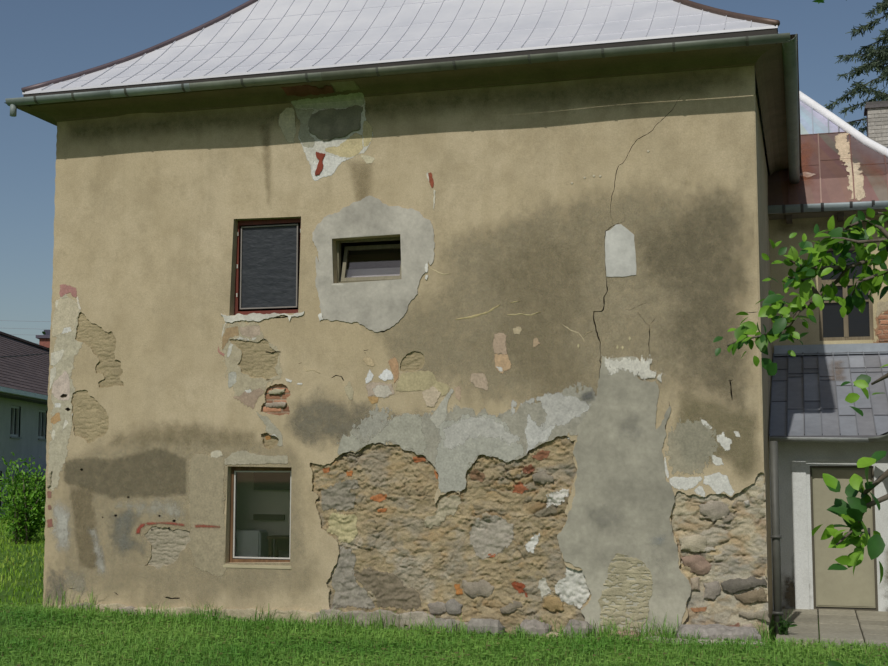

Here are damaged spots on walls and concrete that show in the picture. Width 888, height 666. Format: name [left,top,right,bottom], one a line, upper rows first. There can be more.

peeling [279,81,375,181]
peeling [46,284,124,528]
leakage [53,437,287,597]
peeling [218,311,305,449]
spalling [53,351,597,634]
leakage [292,401,373,442]
leakage [393,194,738,400]
crack [593,100,678,377]
leakage [680,400,753,472]
spalling [664,418,770,639]
spalling [872,301,888,343]